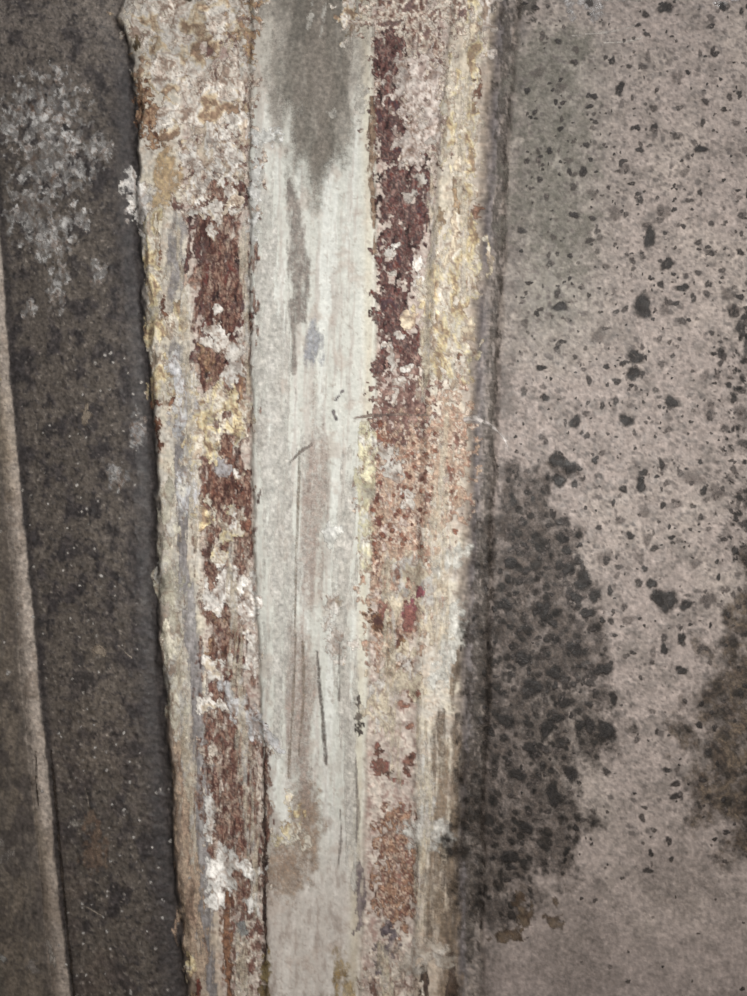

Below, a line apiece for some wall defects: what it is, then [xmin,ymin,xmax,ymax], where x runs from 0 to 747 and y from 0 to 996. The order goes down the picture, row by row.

water stain [250,0,369,207]
peeling [108,0,285,754]
corrosion [129,0,328,996]
peeling [203,793,268,917]
water stain [239,140,324,759]
corrosion [354,695,365,736]
peeling [354,421,416,569]
corrosion [371,742,416,786]
peeling [381,550,444,646]
corrosion [352,0,485,684]
water stain [411,0,616,996]
water stain [670,590,747,862]